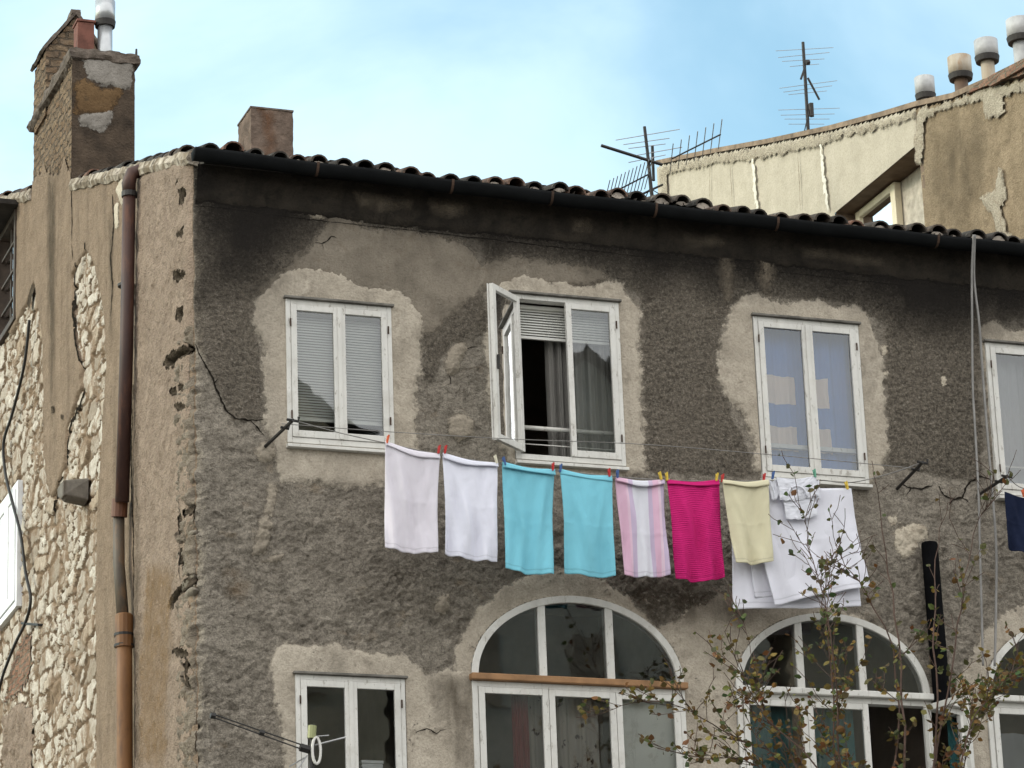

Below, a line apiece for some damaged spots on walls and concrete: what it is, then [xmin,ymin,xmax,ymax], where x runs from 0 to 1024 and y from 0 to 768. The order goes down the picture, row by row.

flaking render [0,253,106,768]
crack [53,195,114,514]
peeling [73,78,124,115]
spalling [163,305,199,768]
crack [195,344,264,435]
peeling [979,167,1012,236]